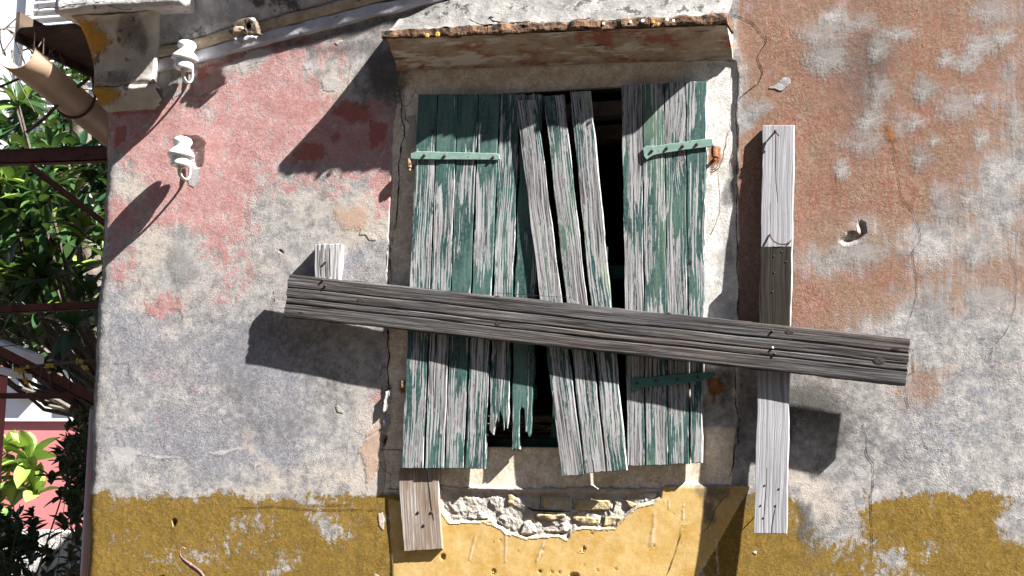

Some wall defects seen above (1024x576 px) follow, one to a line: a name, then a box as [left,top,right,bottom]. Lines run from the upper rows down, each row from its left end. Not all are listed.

peeling [157,57,184,99]
peeling [228,16,273,72]
peeling [768,77,791,91]
flaking render [181,134,206,187]
crack [394,84,416,230]
flaking render [838,219,868,246]
crack [808,140,952,480]
crack [986,234,1018,360]
peeling [359,391,392,482]
flaking render [440,485,662,555]